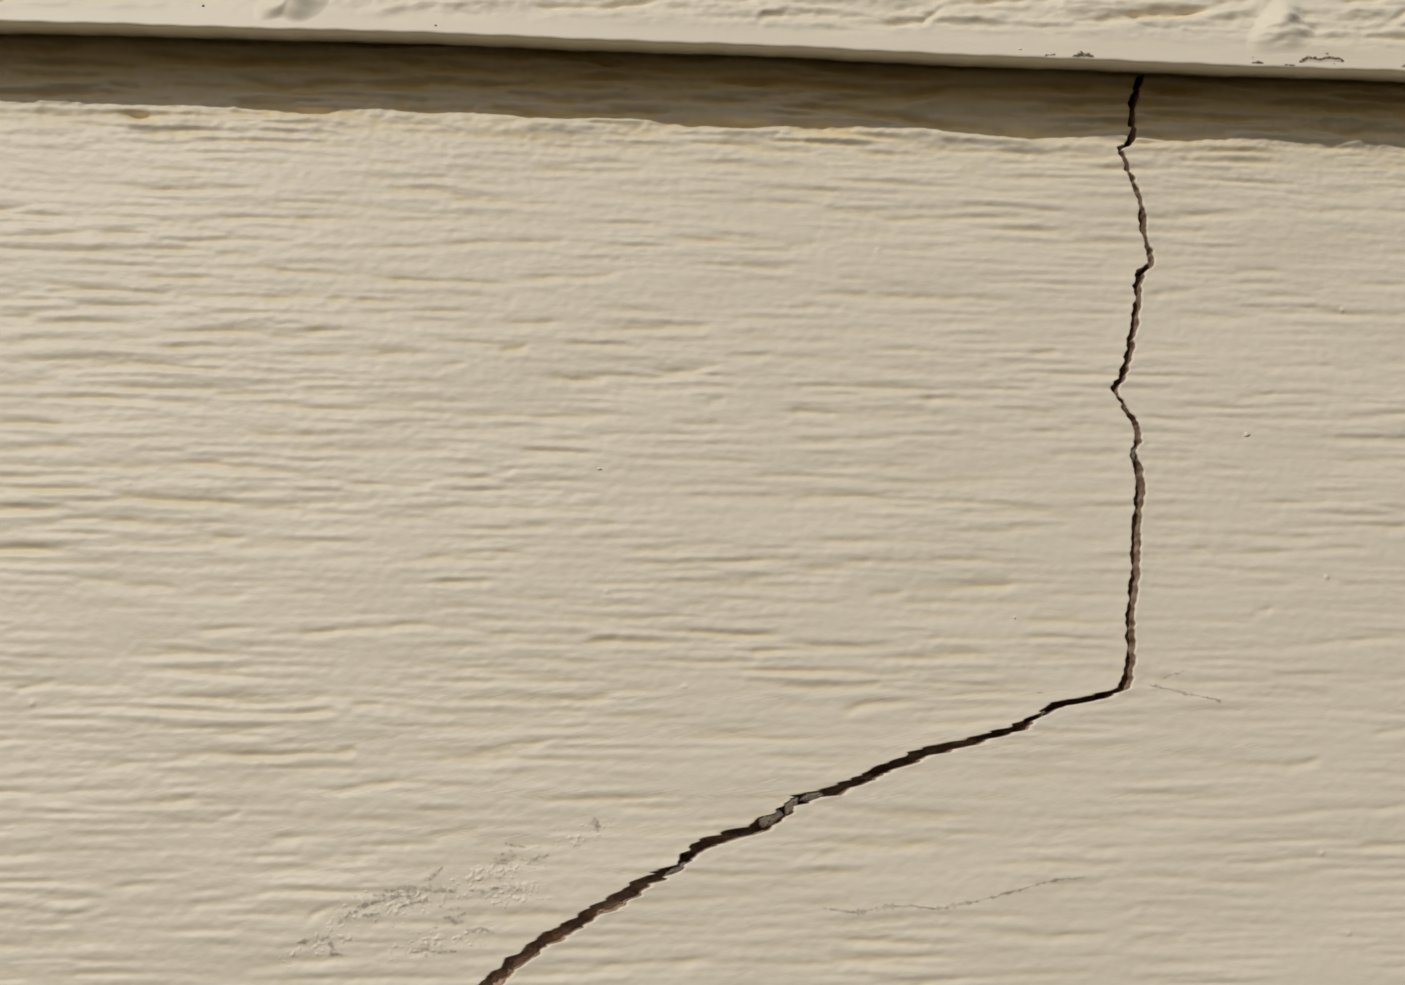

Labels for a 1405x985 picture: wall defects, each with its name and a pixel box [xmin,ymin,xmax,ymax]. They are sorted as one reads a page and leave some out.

crack [479,75,1154,985]